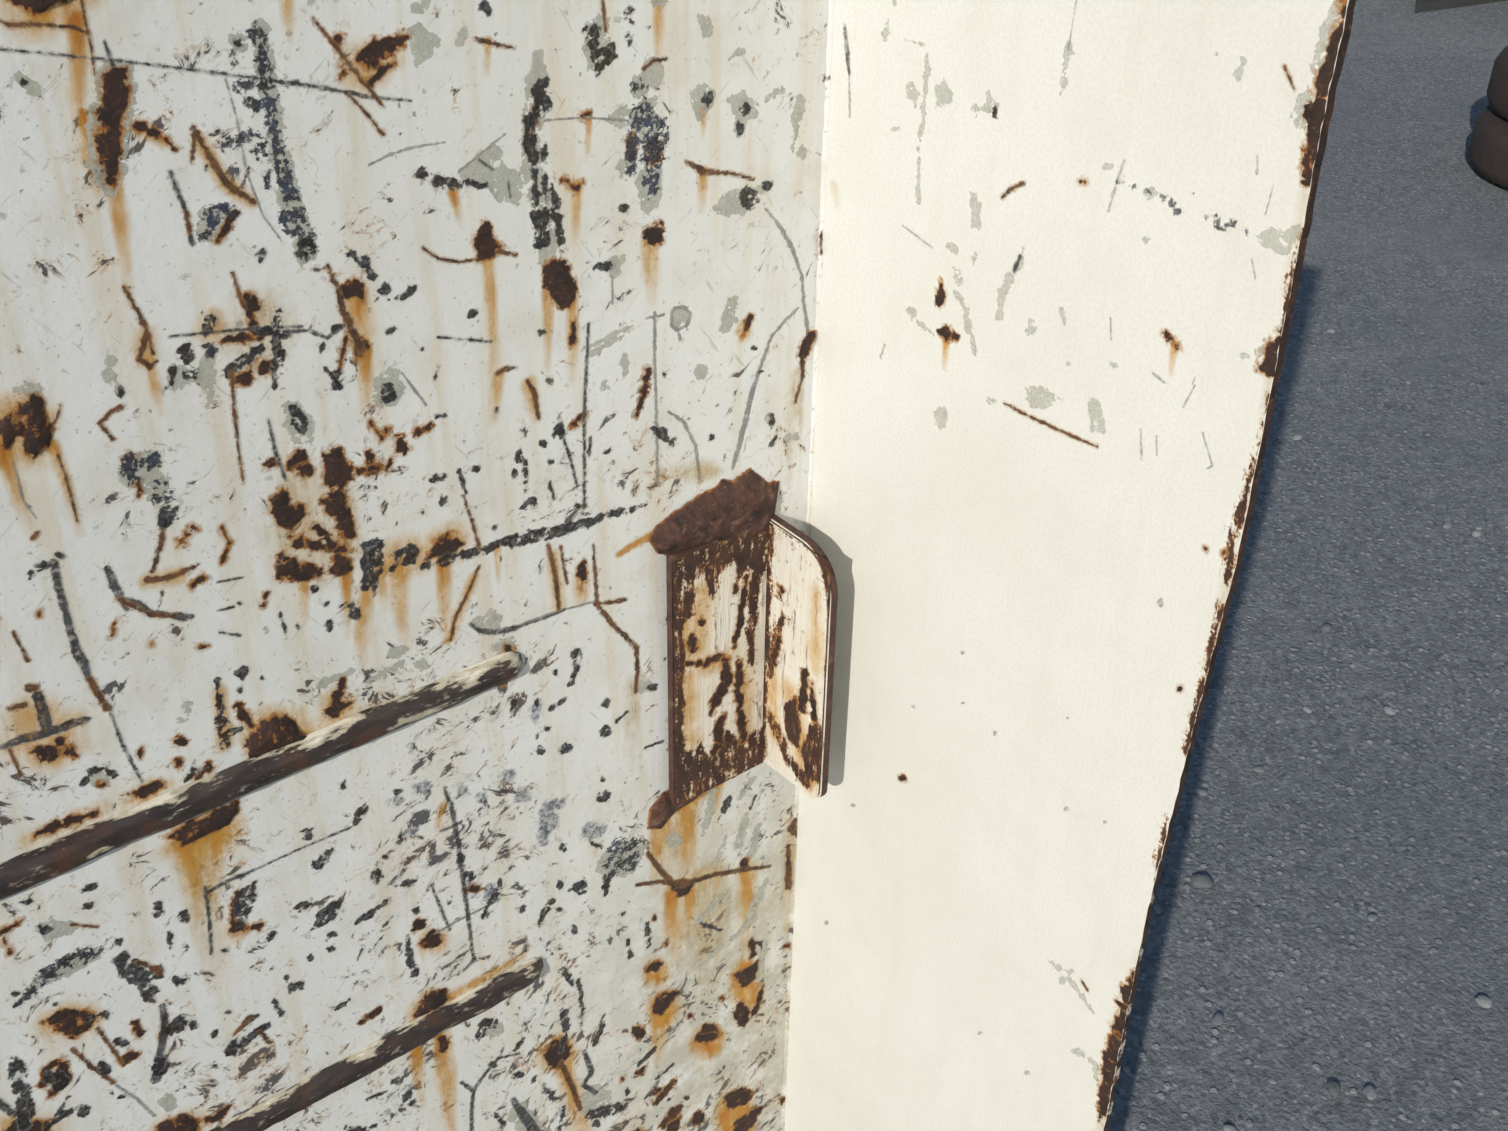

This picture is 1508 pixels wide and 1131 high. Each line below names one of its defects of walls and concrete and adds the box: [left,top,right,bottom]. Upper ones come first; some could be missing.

rust [0,0,178,239]
peeling [414,49,562,265]
peeling [582,0,667,77]
peeling [605,56,667,215]
rust [1300,0,1347,187]
rust [220,264,372,481]
rust [259,419,450,626]
rust [1177,228,1303,755]
rust [131,688,307,801]
rust [652,522,831,859]
rust [40,1008,232,1131]
rust [631,937,765,1058]